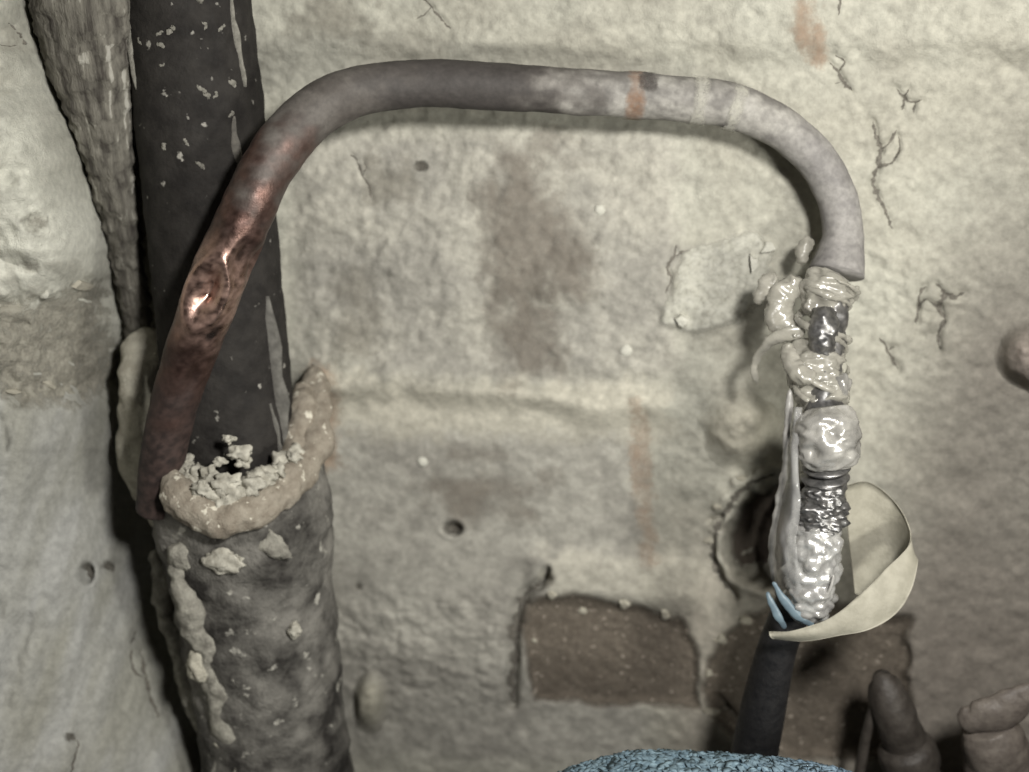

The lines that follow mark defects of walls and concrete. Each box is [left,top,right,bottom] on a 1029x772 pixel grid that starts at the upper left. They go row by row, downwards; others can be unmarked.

crack [830,55,852,91]
crack [871,89,922,229]
water stain [487,157,583,369]
crack [915,284,965,350]
spalling [732,483,805,570]
spalling [521,591,770,734]
spalling [806,603,847,627]
spalling [779,615,913,760]